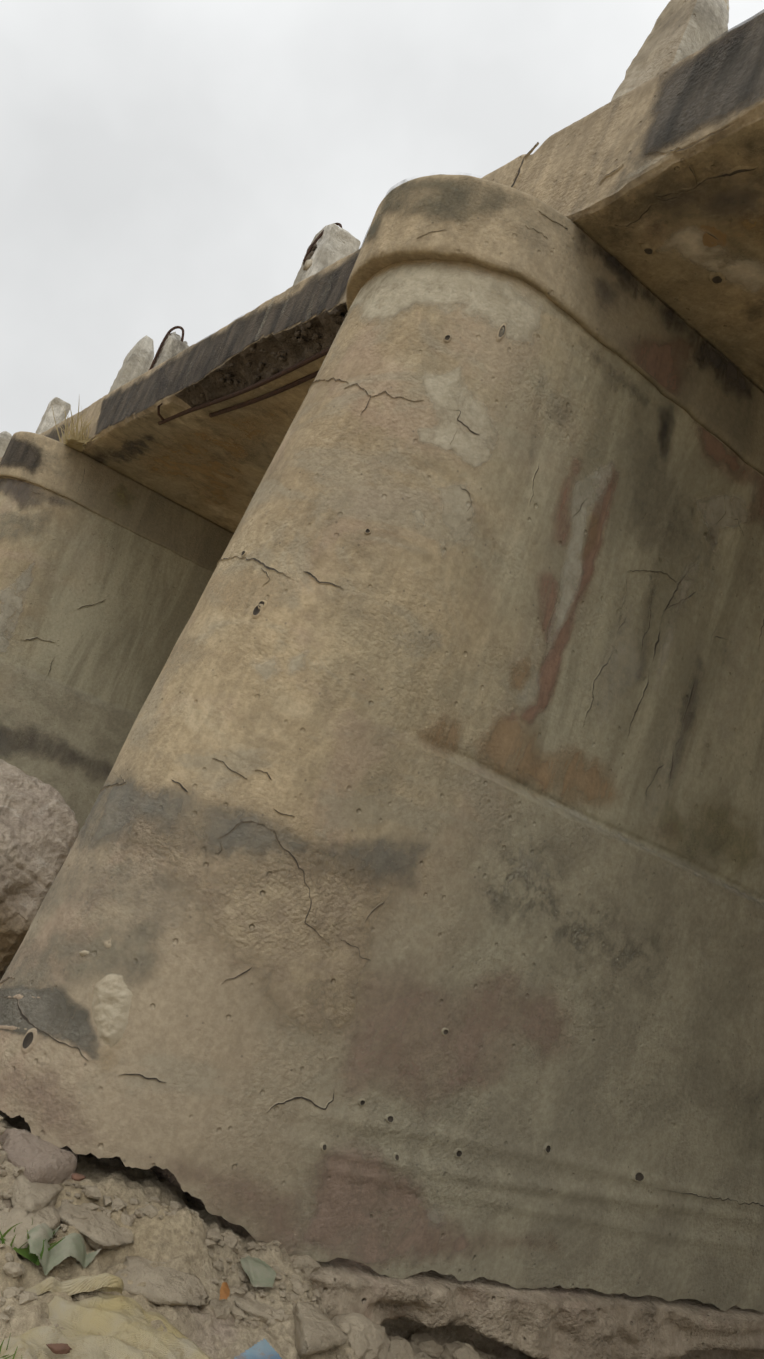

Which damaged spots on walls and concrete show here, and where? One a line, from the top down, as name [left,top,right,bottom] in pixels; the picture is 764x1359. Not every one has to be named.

water stain [644,9,764,154]
crack [511,142,539,188]
crack [525,211,568,239]
spalling [157,322,330,425]
crack [308,377,423,415]
corrosion [514,474,615,723]
crack [583,548,703,741]
crack [171,779,189,793]
crack [214,758,385,961]